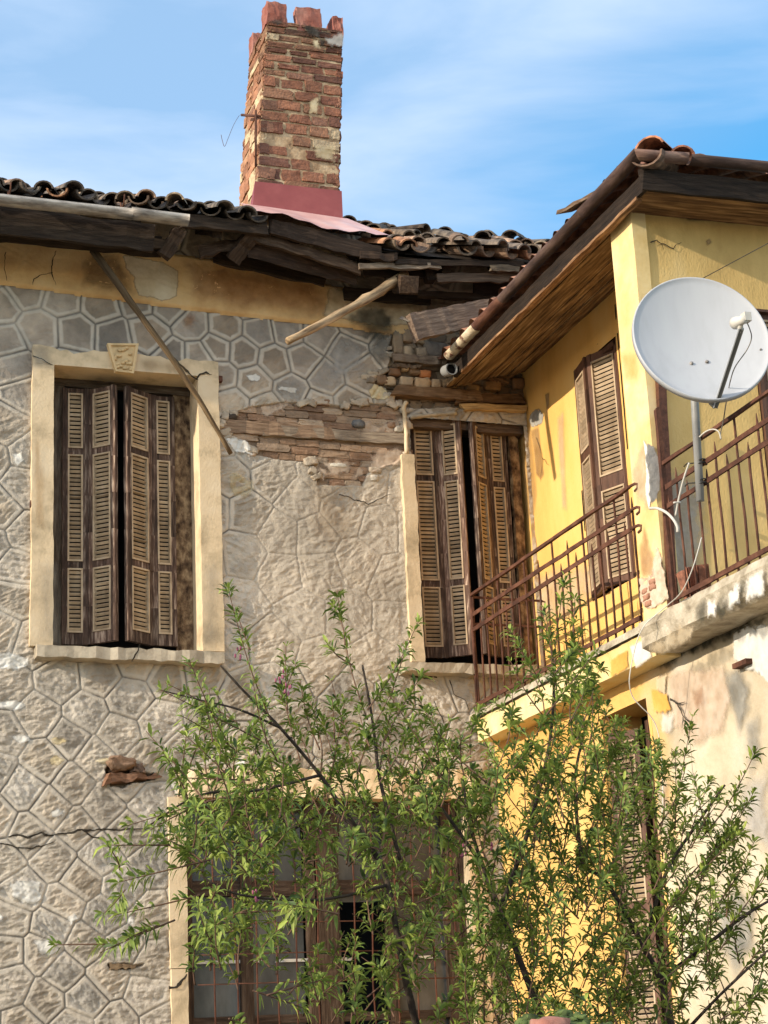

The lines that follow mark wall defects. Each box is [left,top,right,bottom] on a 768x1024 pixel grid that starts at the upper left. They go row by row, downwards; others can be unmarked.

peeling [123,256,178,301]
crack [174,357,212,380]
flaking render [220,288,543,486]
flaking render [644,442,660,507]
flaking render [639,547,668,608]
crack [0,828,150,850]